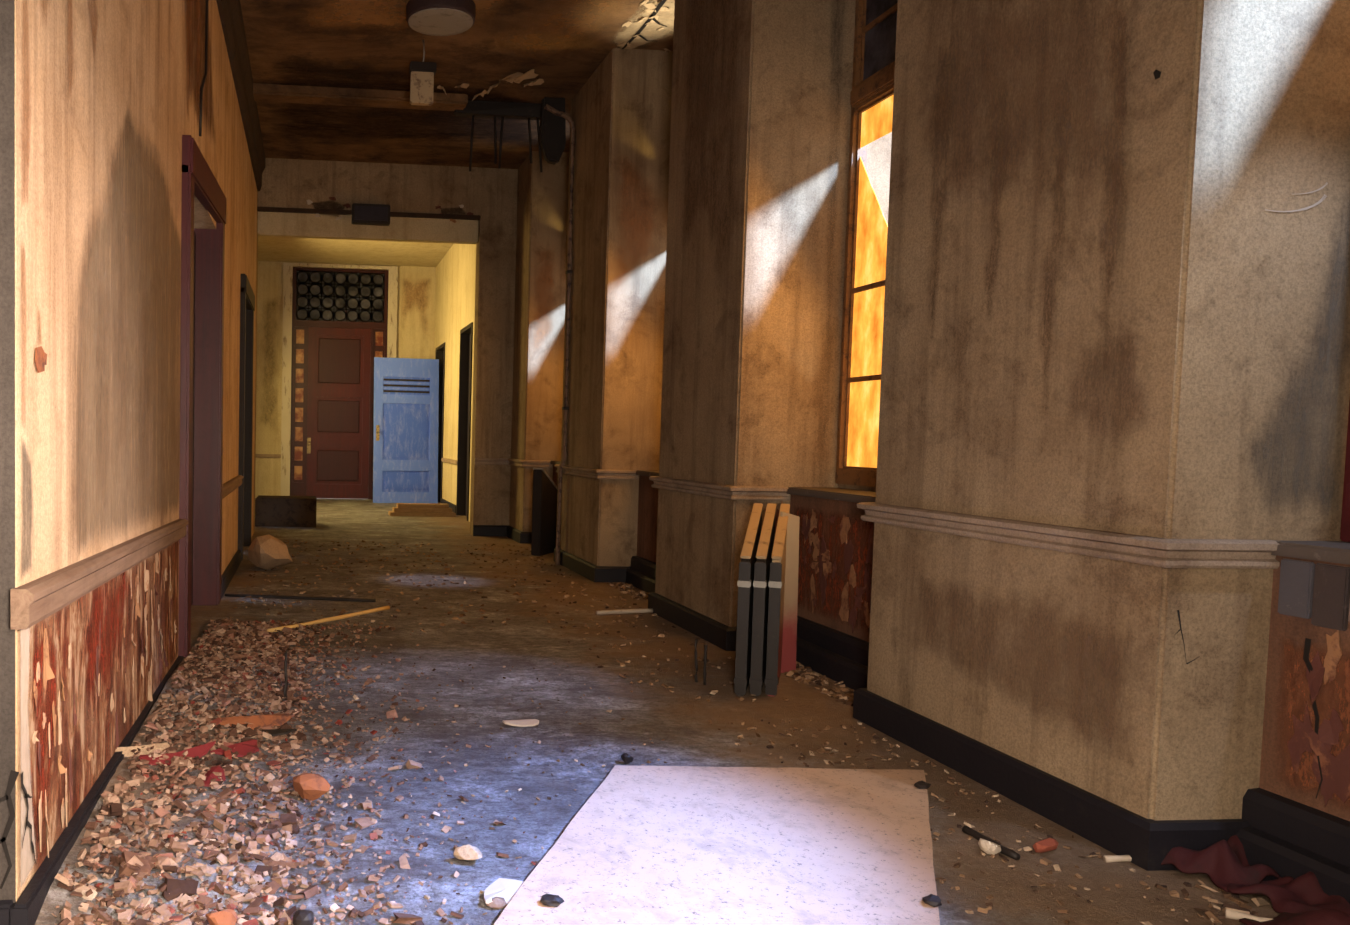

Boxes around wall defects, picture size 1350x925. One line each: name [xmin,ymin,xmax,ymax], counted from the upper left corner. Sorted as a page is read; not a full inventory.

peeling [615,0,675,52]
peeling [20,540,179,885]
crack [0,770,36,889]